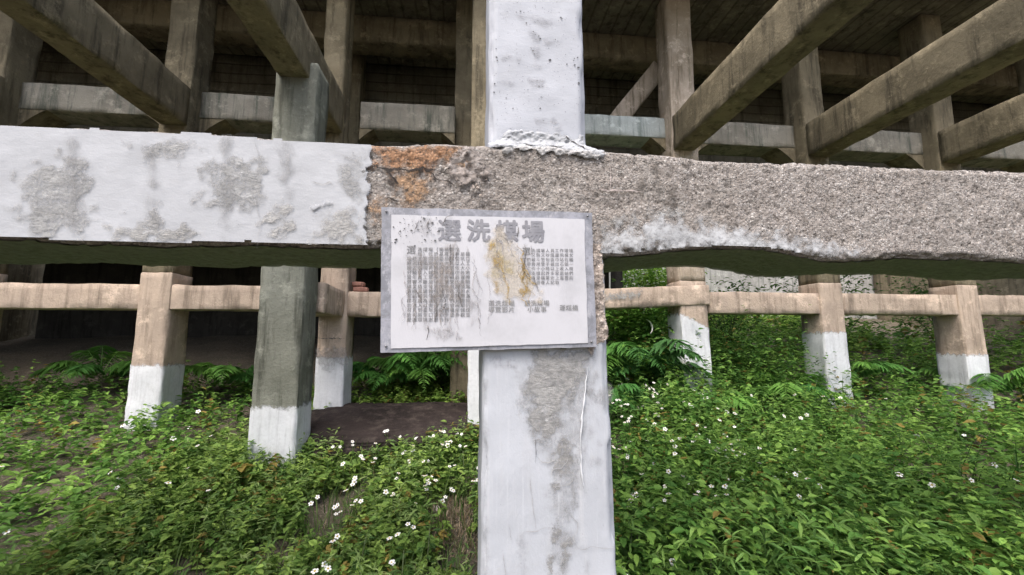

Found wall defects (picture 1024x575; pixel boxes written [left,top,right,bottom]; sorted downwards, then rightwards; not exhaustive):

peeling [0,125,372,246]
rust [372,145,465,207]
spalling [448,147,492,196]
peeling [521,208,859,490]
peeling [547,529,572,572]